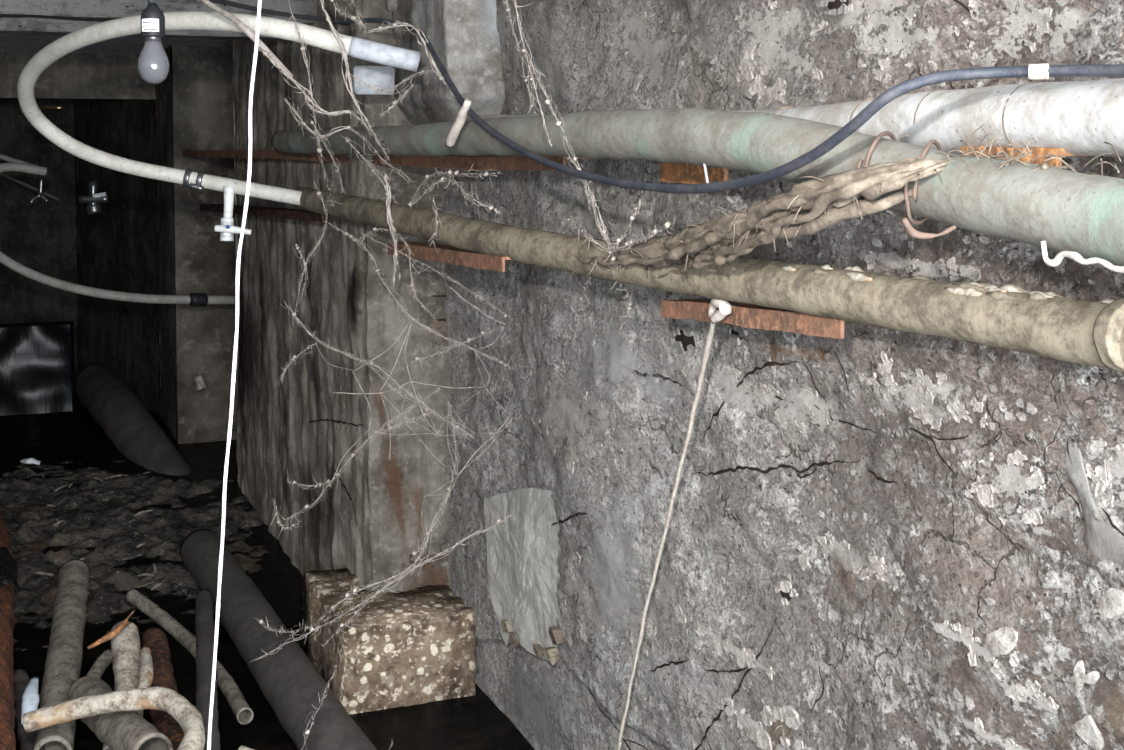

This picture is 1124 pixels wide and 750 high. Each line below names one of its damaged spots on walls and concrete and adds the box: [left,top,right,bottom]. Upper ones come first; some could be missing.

crack [632,370,683,386]
crack [703,352,873,438]
crack [697,461,898,484]
crack [908,428,970,481]
crack [648,617,777,750]
crack [587,688,648,750]